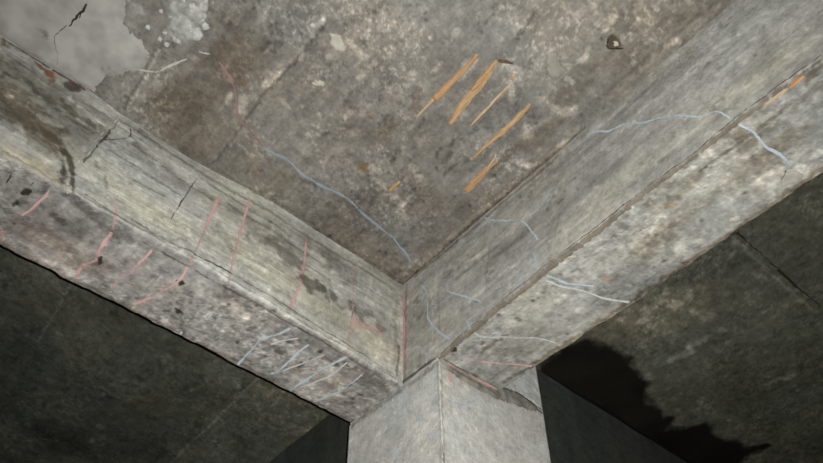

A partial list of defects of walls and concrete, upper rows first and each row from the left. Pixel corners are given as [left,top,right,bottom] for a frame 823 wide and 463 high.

rust [3,40,85,90]
crack [54,4,87,48]
water stain [157,0,210,48]
spalling [607,35,623,50]
crack [139,51,412,262]
crack [133,196,219,305]